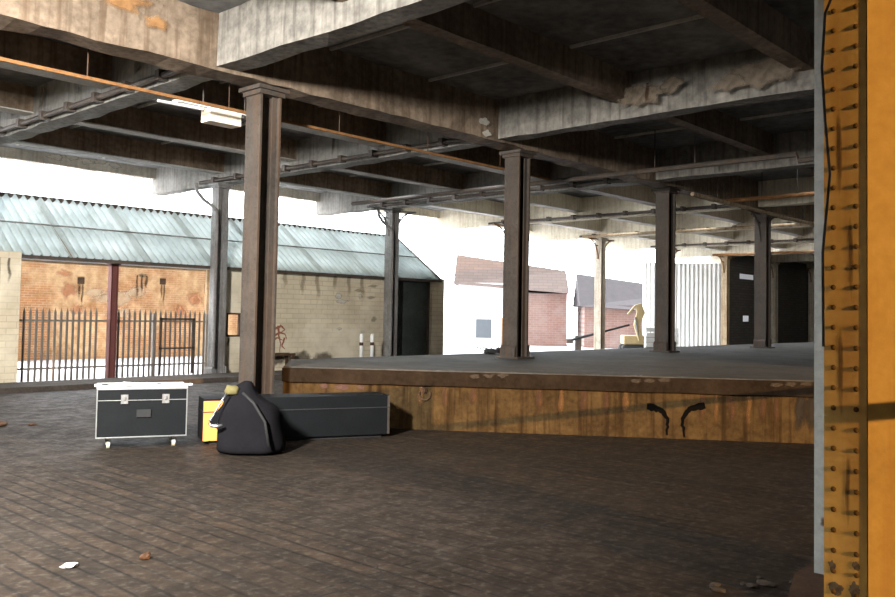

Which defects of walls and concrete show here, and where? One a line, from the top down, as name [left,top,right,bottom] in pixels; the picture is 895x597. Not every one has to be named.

crack [647,402,706,437]